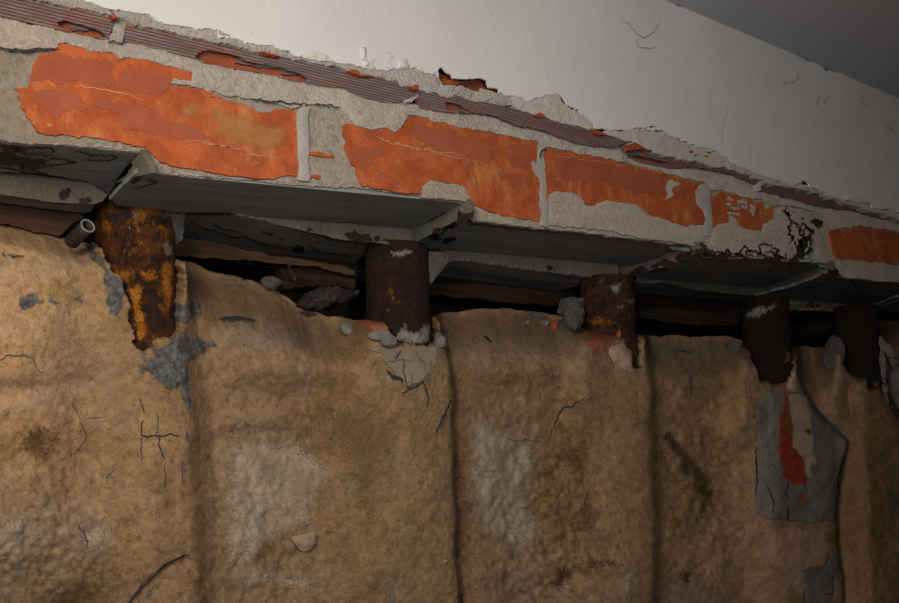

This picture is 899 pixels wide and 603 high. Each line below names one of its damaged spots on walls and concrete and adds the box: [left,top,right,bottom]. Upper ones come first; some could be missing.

flaking render [15,0,899,265]
peeling [138,301,215,410]
crack [139,399,182,488]
water stain [223,437,329,592]
water stain [455,418,540,592]